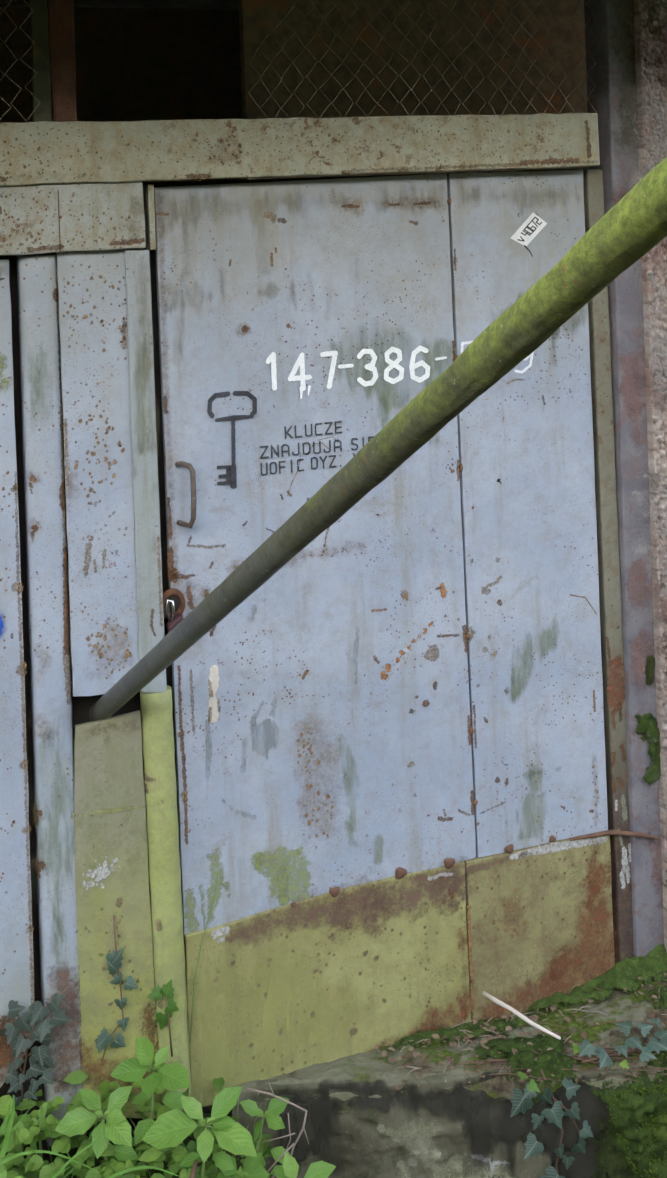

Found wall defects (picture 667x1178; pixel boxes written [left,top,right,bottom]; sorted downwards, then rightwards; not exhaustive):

rust [52,264,127,704]
rust [150,498,209,636]
rust [0,471,149,1093]
rust [297,728,333,837]
peeling [82,856,120,890]
rust [226,850,616,1036]
rust [138,1000,167,1051]
water stain [276,1072,612,1178]